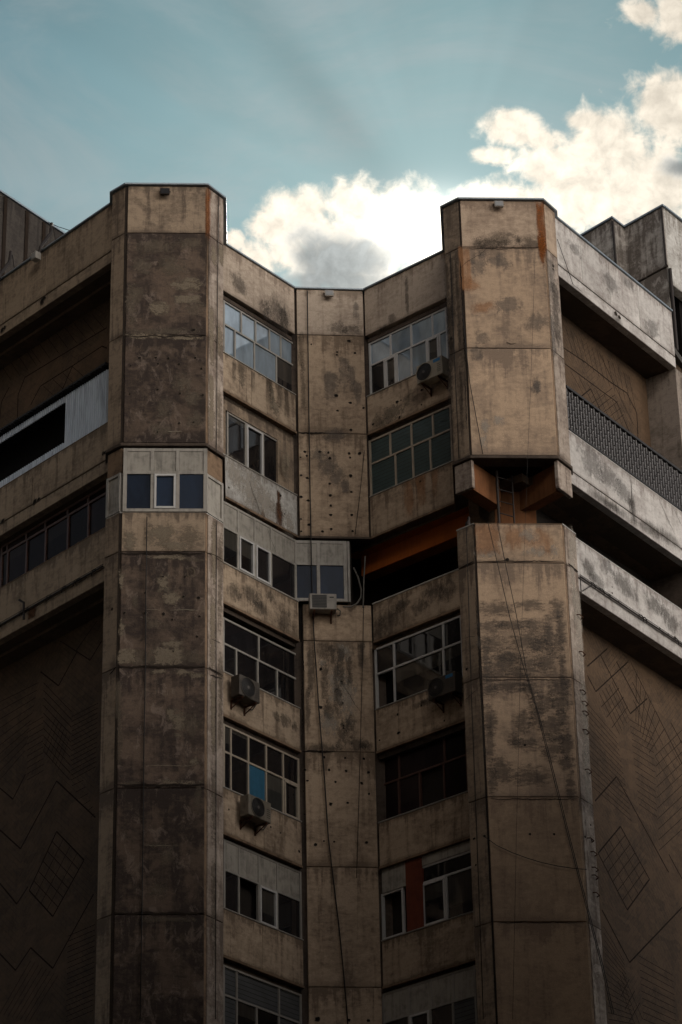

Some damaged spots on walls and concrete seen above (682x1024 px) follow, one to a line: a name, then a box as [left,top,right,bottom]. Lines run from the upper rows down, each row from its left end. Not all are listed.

rust [536,203,546,263]